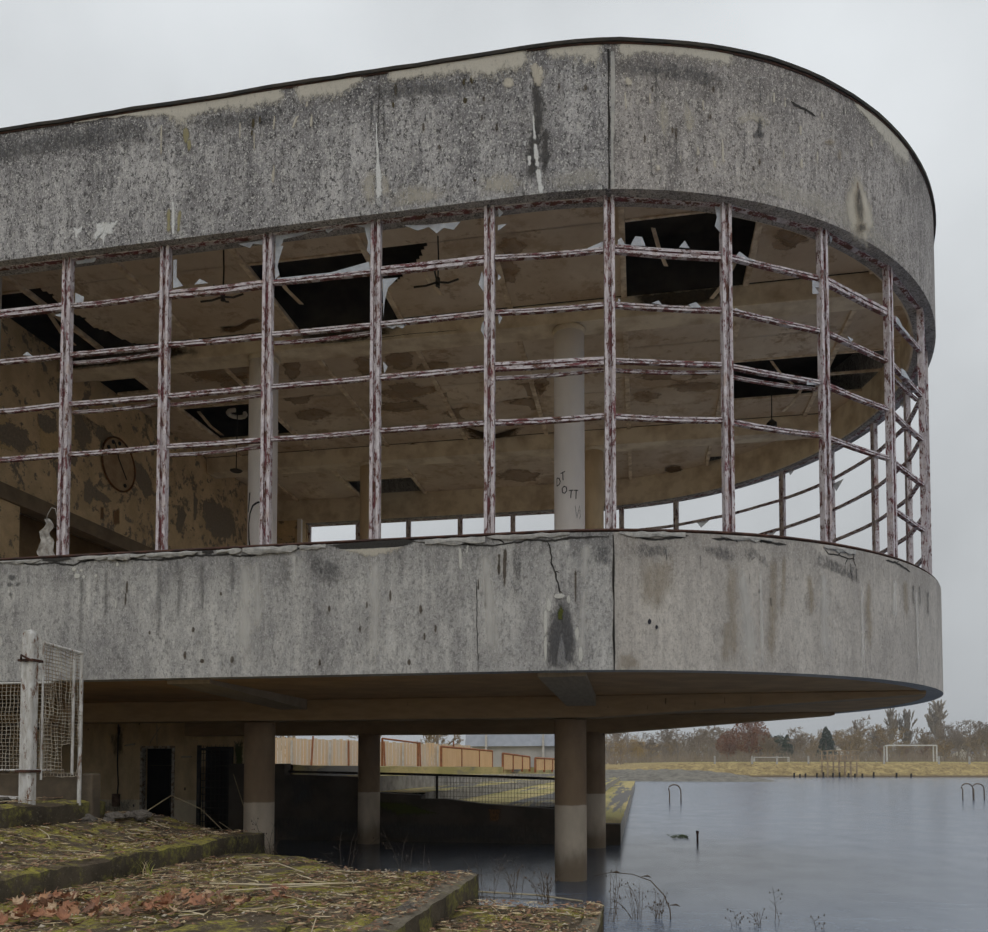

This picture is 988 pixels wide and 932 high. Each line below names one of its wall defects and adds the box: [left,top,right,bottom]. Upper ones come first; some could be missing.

water stain [366,102,385,206]
water stain [524,82,550,194]
peeling [0,413,59,453]
peeling [71,414,113,467]
peeling [176,493,238,543]
crack [461,536,609,594]
crack [635,535,786,545]
crack [825,550,856,566]
water stain [543,548,587,666]